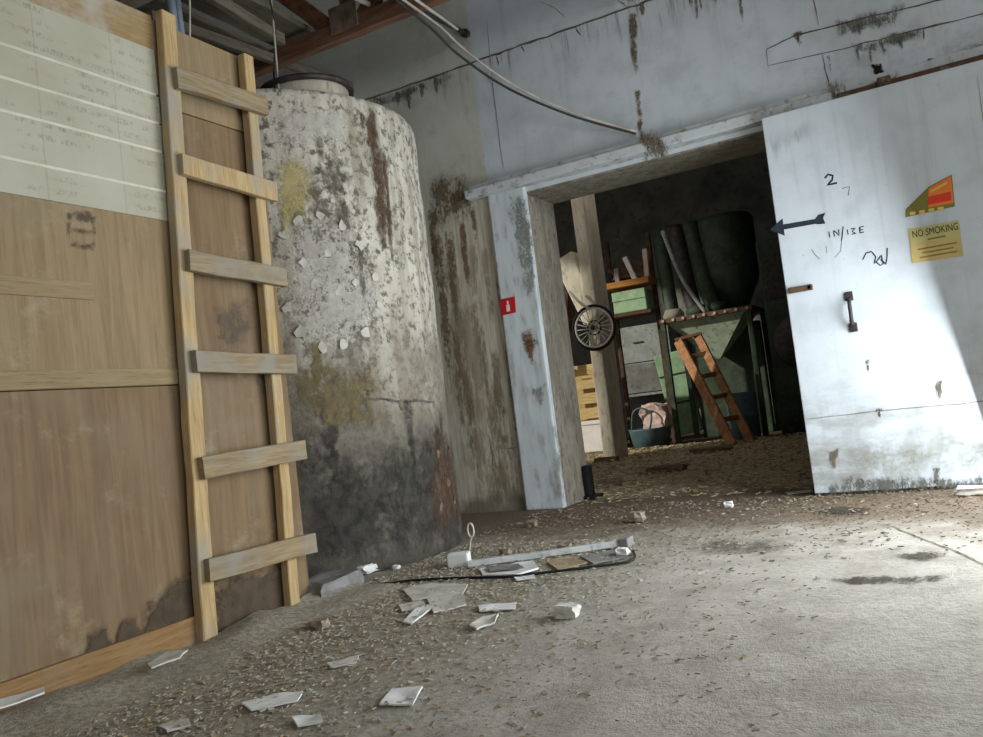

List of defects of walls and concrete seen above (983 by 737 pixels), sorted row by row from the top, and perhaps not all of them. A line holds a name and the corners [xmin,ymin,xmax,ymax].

water stain [838,8,919,61]
water stain [370,78,442,109]
corrosion [361,111,394,258]
water stain [428,175,476,366]
corrosion [522,332,537,362]
water stain [298,343,460,559]
crack [870,523,983,564]